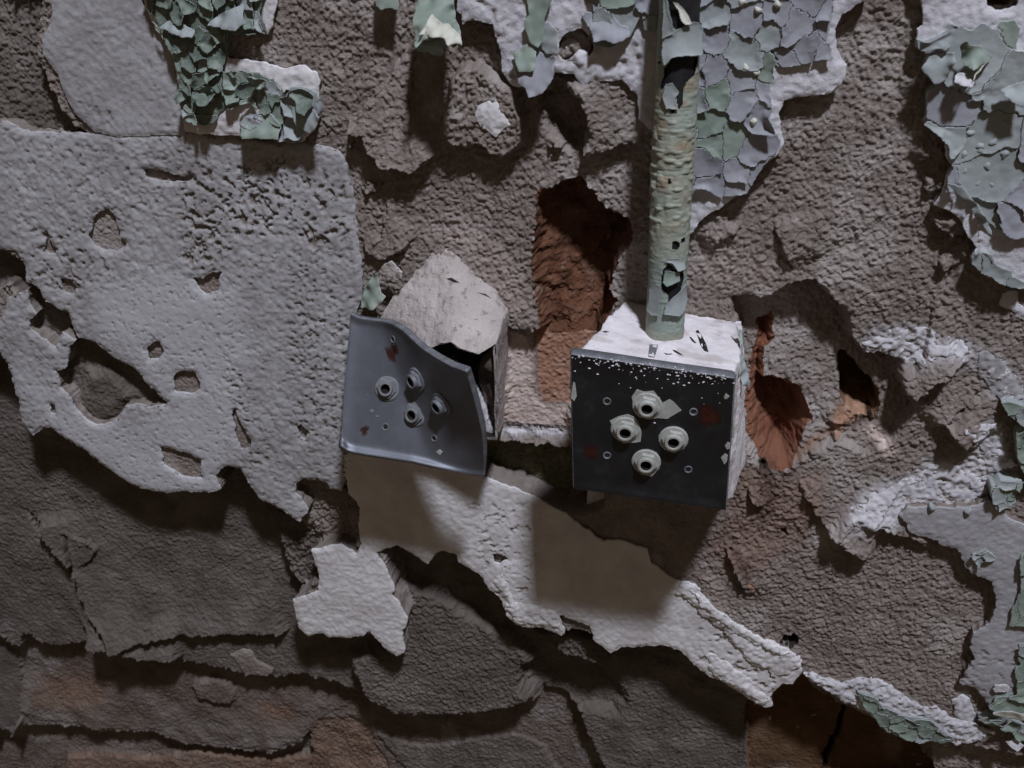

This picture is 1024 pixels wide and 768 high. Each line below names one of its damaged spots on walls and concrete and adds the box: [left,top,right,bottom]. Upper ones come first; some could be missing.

peeling [145,0,323,143]
peeling [413,0,462,56]
peeling [513,0,834,198]
peeling [914,20,1024,289]
spalling [0,250,72,336]
spalling [531,176,633,406]
spalling [62,338,162,420]
spalling [732,279,913,471]
peeling [987,397,1024,512]
spalling [0,353,955,768]
crack [821,704,846,767]
peeling [977,643,1024,752]